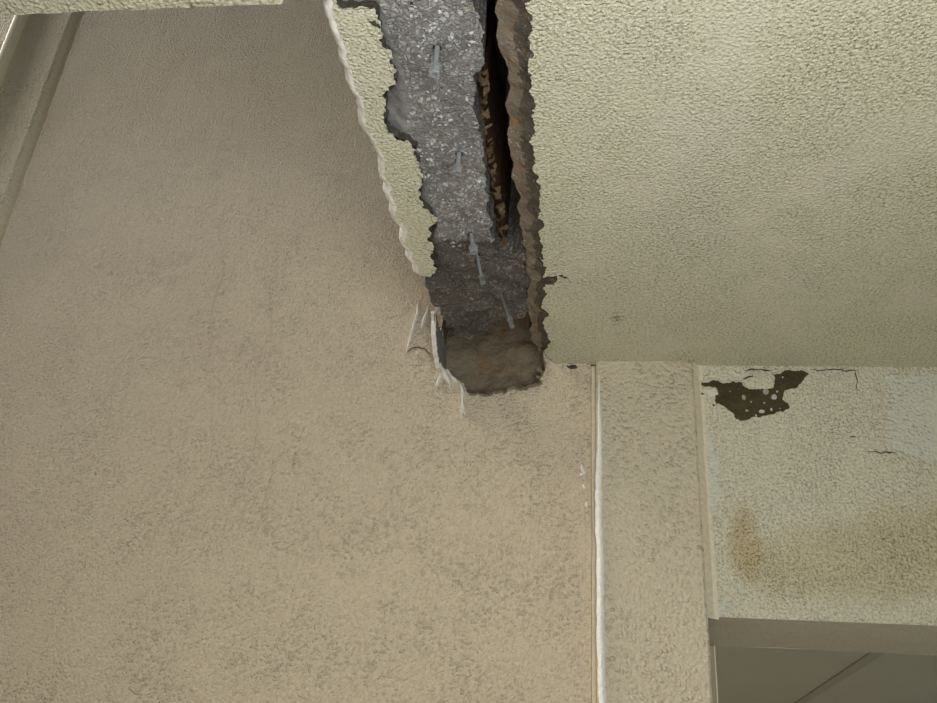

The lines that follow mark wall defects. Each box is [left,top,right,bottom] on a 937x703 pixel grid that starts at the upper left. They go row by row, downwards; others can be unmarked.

spalling [335,0,568,417]
spalling [699,368,812,423]
crack [814,369,858,390]